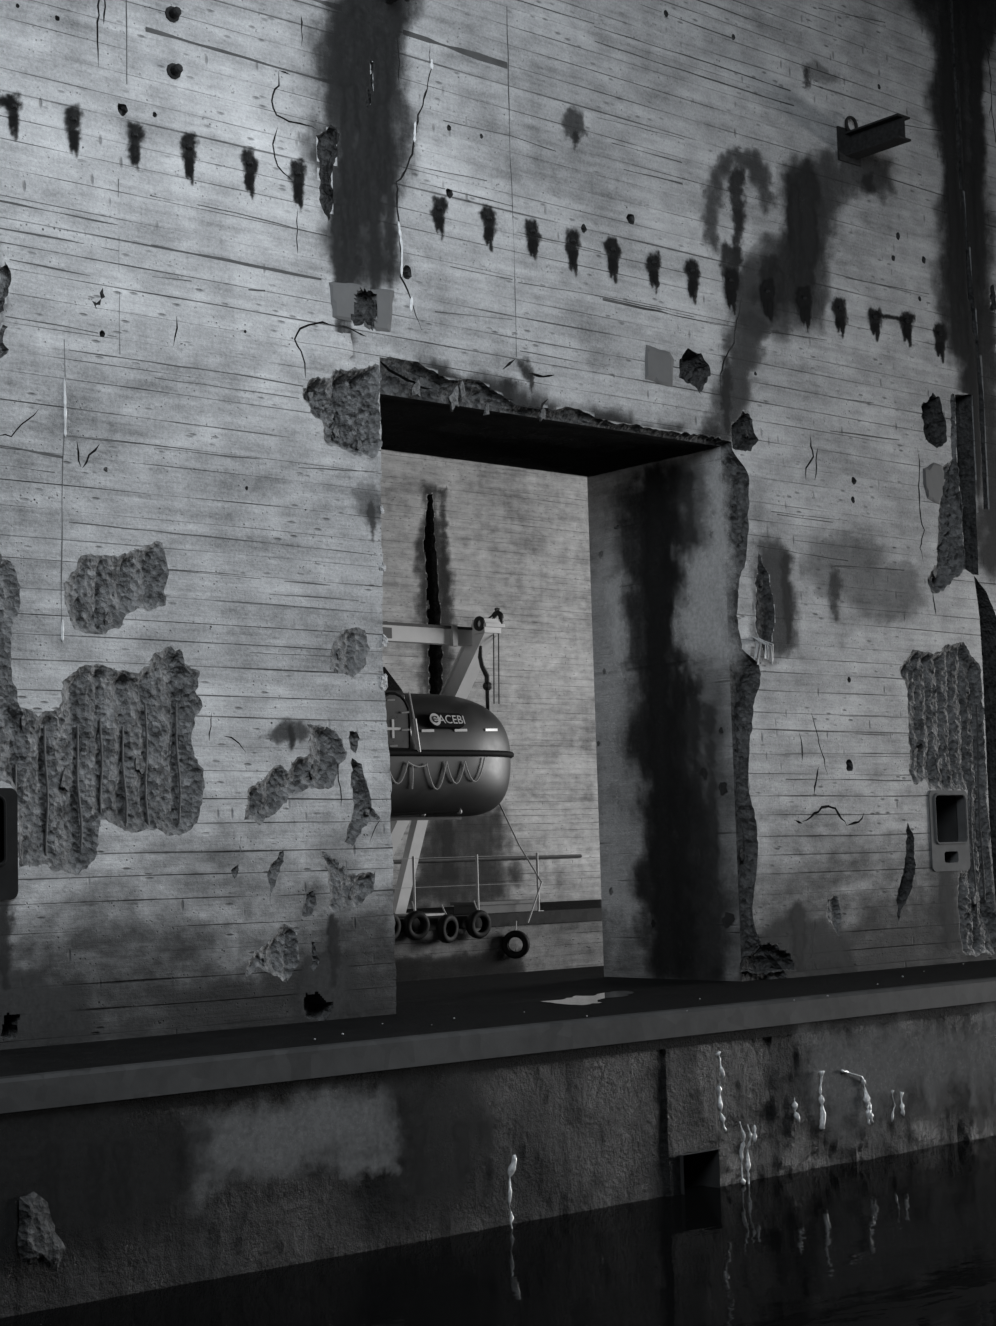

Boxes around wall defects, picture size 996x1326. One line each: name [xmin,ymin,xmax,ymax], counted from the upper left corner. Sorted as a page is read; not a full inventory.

damp [306,0,417,304]
spalling [679,348,711,394]
damp [700,148,893,441]
spalling [921,393,965,594]
damp [912,0,996,578]
spalling [0,541,205,875]
spalling [244,724,380,846]
damp [393,806,520,909]
spalling [302,357,795,981]
damp [606,455,731,981]
crack [795,713,864,826]
spalling [896,642,996,957]